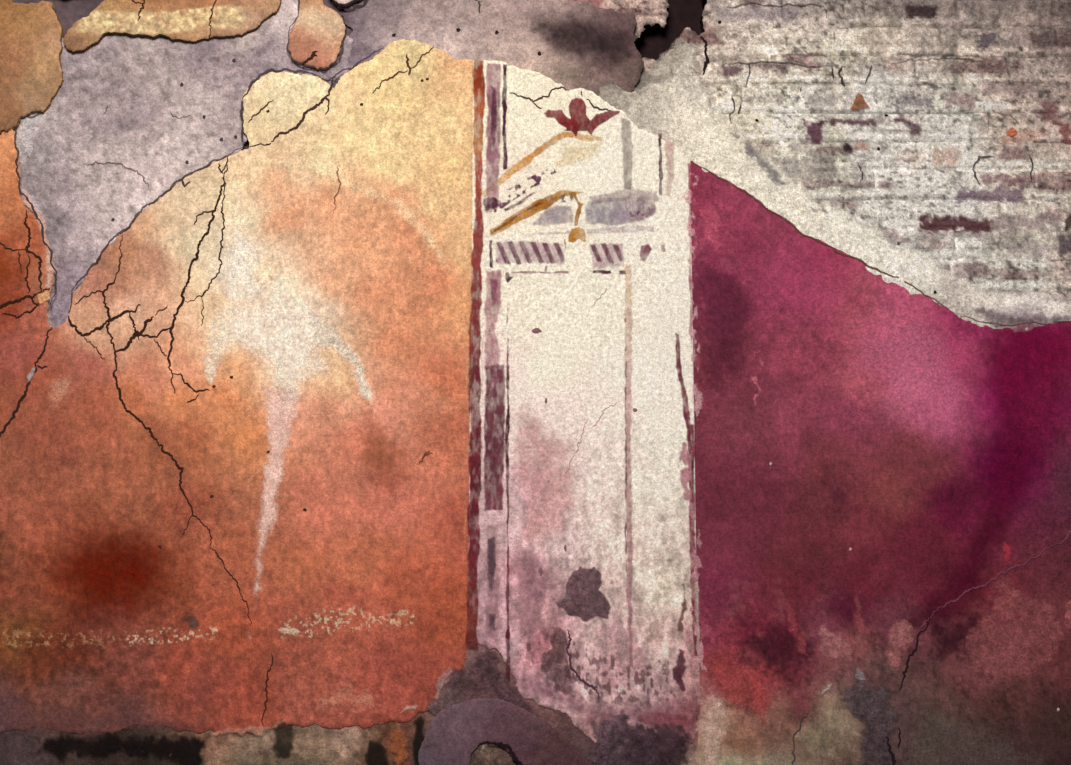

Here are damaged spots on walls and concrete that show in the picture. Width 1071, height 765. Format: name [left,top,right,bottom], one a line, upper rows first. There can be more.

crack [510,86,611,111]
spalling [850,93,869,110]
flaking render [14,0,709,328]
peeling [685,176,721,361]
crack [0,0,434,625]
peeling [693,384,702,416]
damp [205,302,373,590]
crack [564,402,617,476]
damp [278,608,414,637]
crack [899,611,938,690]
spalling [469,742,518,765]
crack [886,727,901,765]